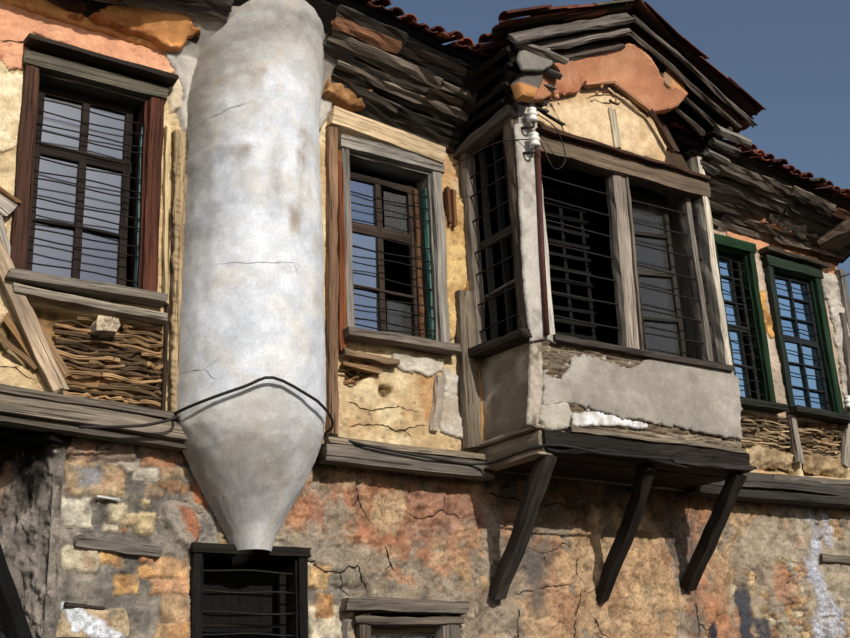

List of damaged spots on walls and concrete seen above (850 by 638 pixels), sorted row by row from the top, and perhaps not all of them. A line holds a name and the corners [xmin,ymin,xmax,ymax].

flaking render [0,1,200,153]
flaking render [322,76,374,112]
flaking render [526,43,688,114]
crack [347,401,419,438]
spalling [378,385,393,398]
flaking render [391,351,463,440]
flaking render [538,354,743,440]
water stain [17,448,46,499]
crack [407,498,472,519]
water stain [821,513,833,546]
crack [308,560,367,596]
crack [513,542,609,638]